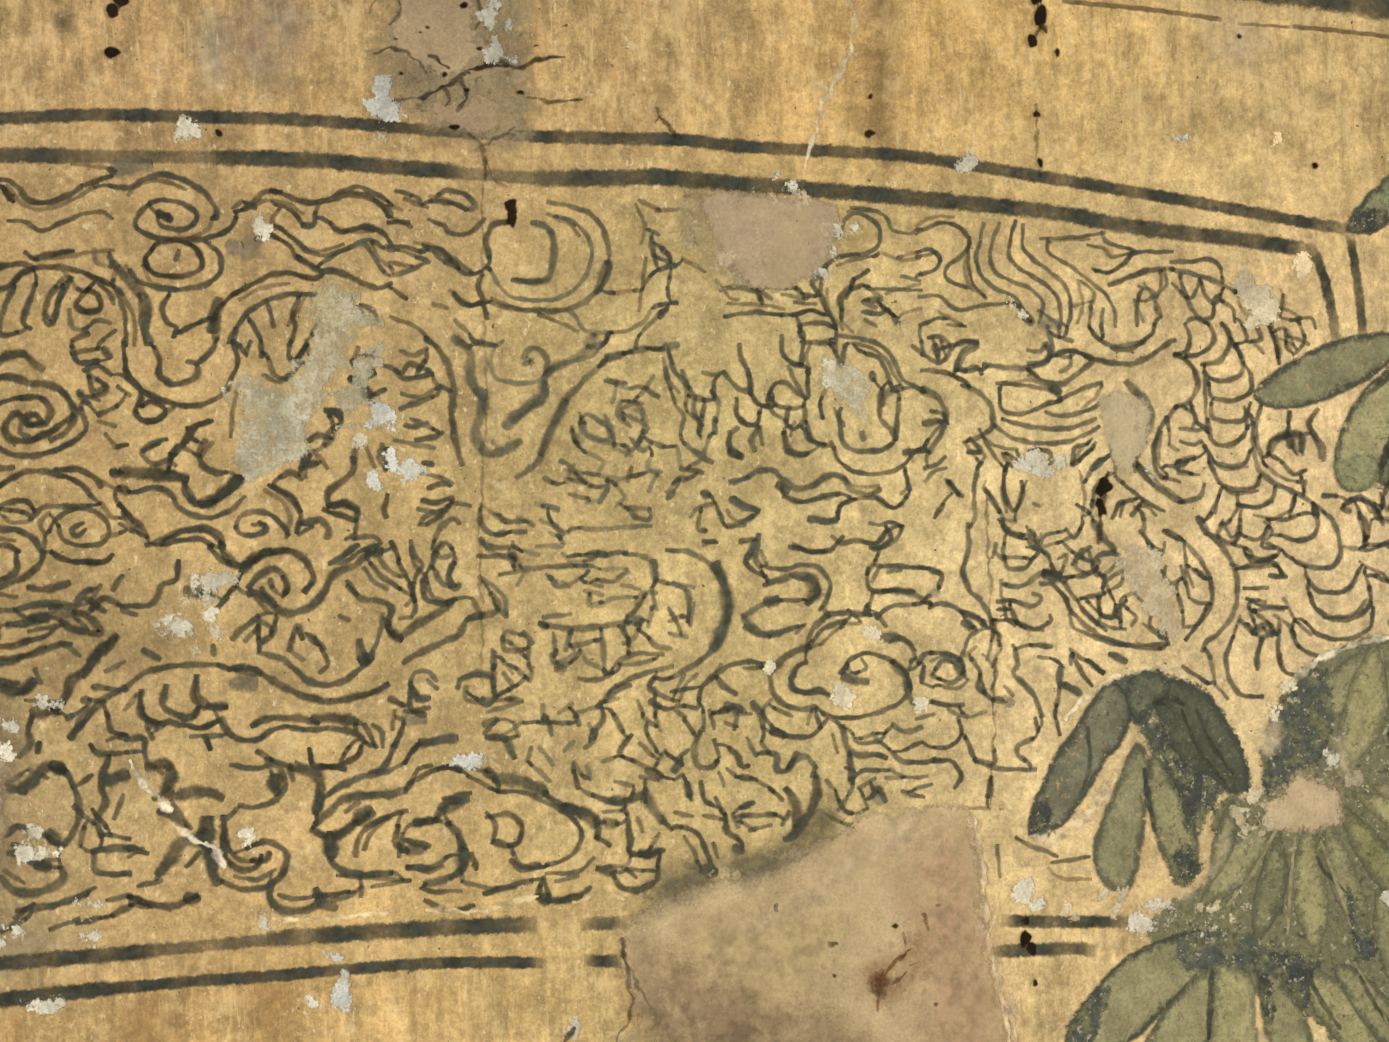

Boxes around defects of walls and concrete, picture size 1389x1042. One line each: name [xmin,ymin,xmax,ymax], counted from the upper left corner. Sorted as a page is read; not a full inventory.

flaking render [363,0,538,146]
peeling [752,170,812,205]
peeling [814,209,860,282]
peeling [306,280,379,337]
peeling [335,341,430,491]
flaking render [1229,733,1369,844]
peeling [0,924,24,948]
peeling [65,898,106,948]
flaking render [618,803,1017,1042]